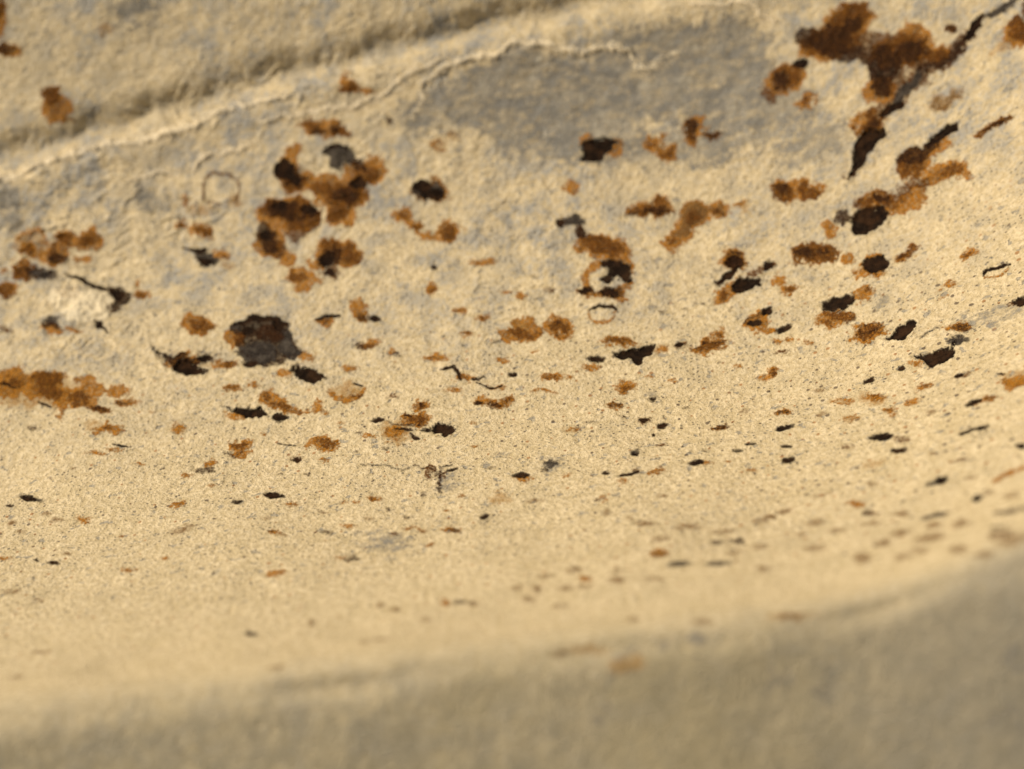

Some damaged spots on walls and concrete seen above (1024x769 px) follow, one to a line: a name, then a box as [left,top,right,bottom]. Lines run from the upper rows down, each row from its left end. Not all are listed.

peeling [0,0,846,184]
corrosion [761,0,960,137]
crack [892,0,1016,105]
corrosion [252,116,389,294]
peeling [410,176,451,203]
corrosion [624,193,746,255]
crack [842,128,887,180]
corrosion [790,122,973,268]
peeling [151,313,327,384]
peeling [581,335,687,372]
peeling [897,334,969,371]
corrosion [0,366,140,436]